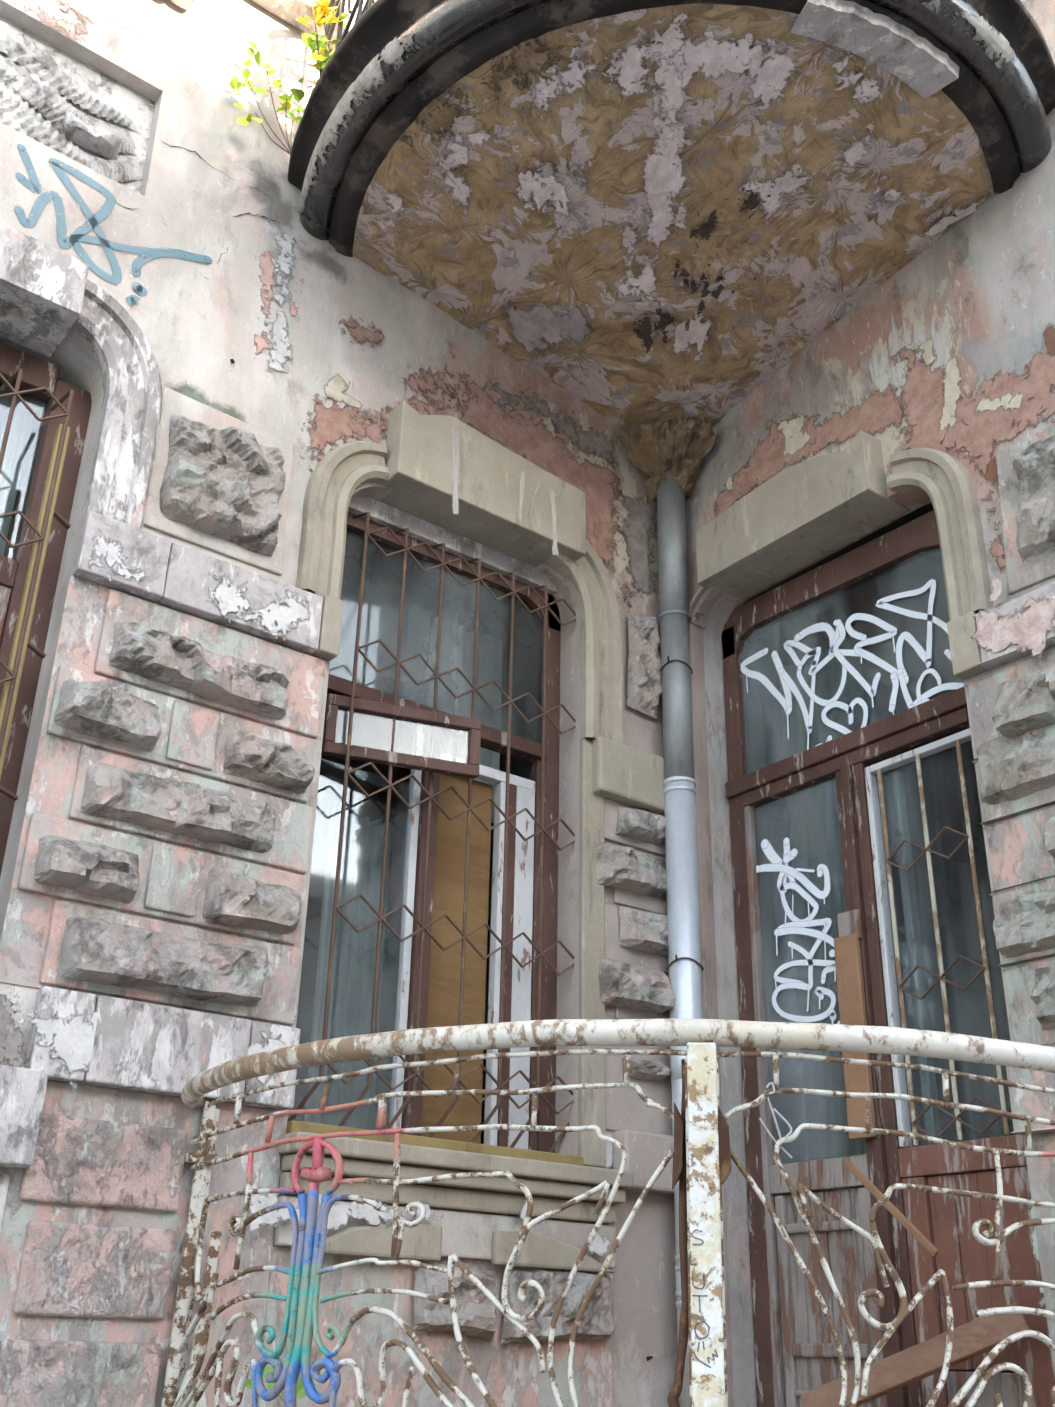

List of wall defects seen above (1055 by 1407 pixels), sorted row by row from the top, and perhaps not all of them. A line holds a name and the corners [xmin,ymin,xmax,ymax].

peeling [24,0,99,41]
peeling [299,32,420,214]
peeling [376,187,411,236]
peeling [397,13,820,371]
peeling [828,47,885,175]
peeling [254,229,304,377]
peeling [339,316,385,351]
peeling [713,337,1055,657]